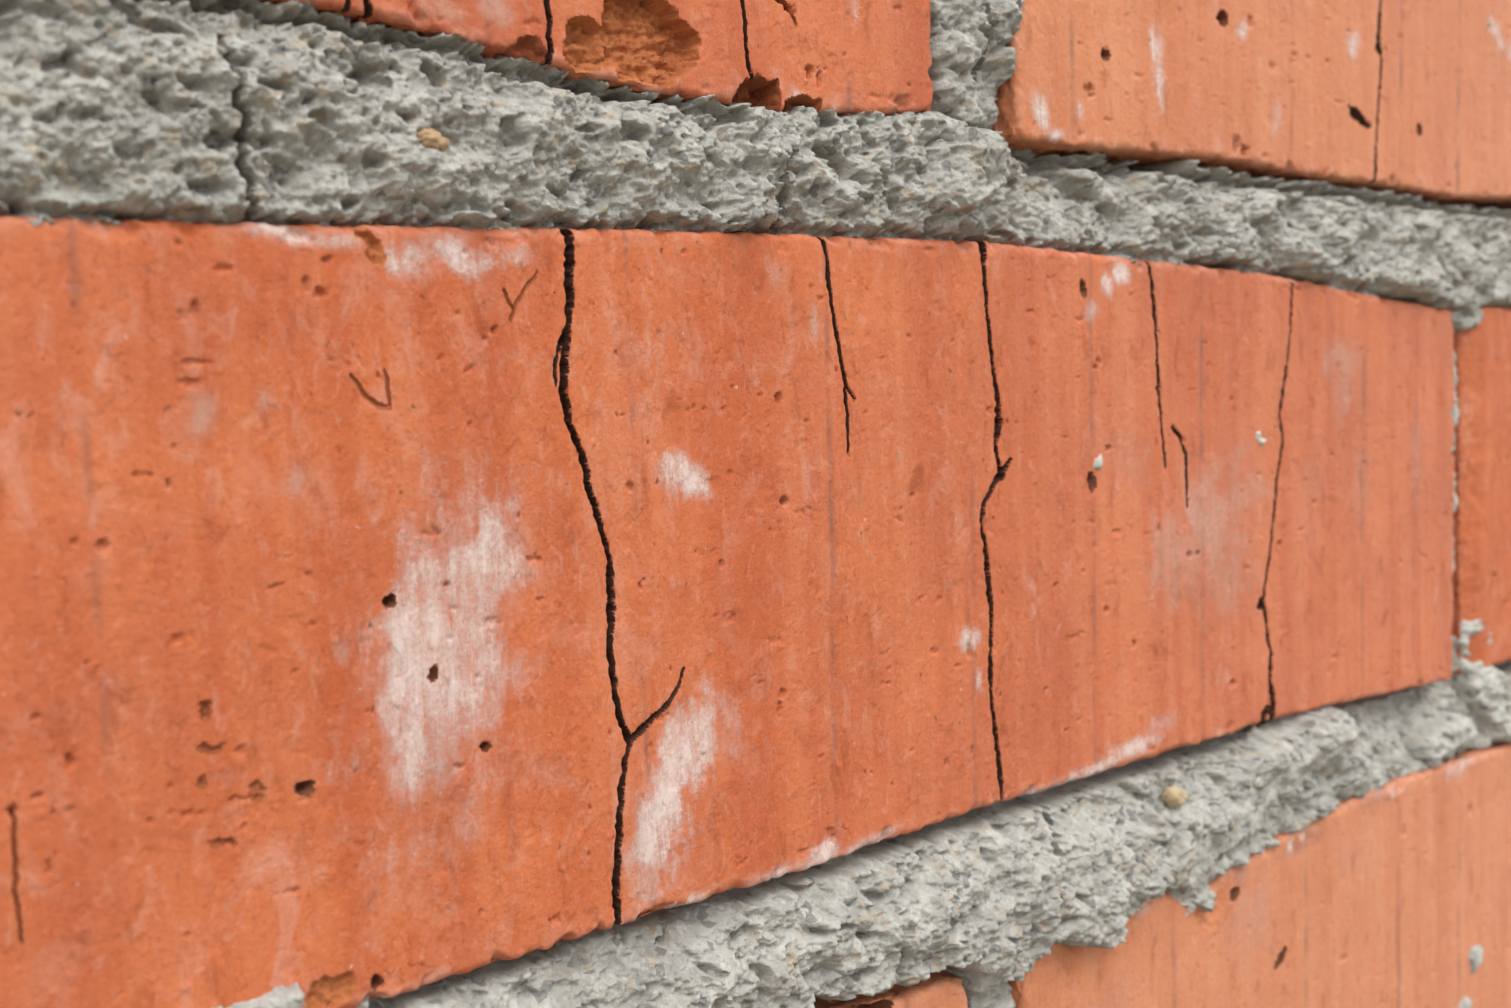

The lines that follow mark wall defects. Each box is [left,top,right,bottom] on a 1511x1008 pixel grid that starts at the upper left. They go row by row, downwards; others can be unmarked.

spalling [503,0,702,88]
crack [738,0,798,89]
crack [759,149,797,233]
crack [817,237,856,452]
damp [380,514,518,788]
crack [502,229,686,925]
crack [975,241,1066,899]
crack [1256,281,1294,722]
damp [631,712,712,867]